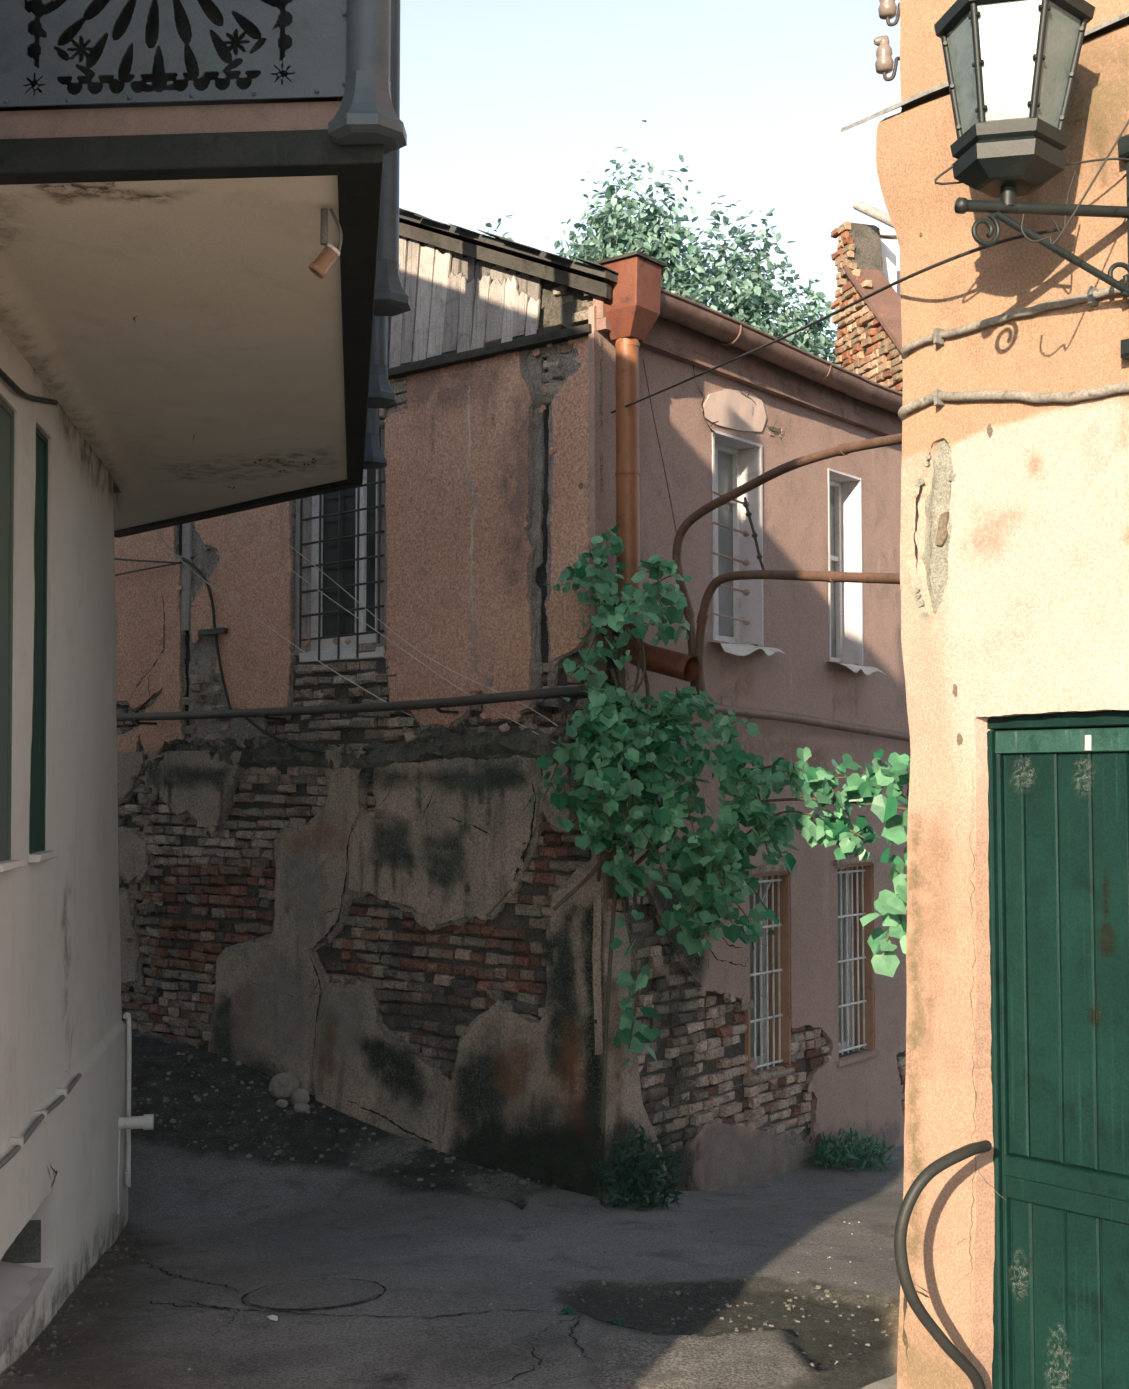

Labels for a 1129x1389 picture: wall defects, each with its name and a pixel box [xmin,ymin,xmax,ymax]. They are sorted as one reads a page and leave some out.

spalling [533,343,573,413]
spalling [913,439,956,619]
spalling [260,636,422,748]
spalling [439,625,630,731]
spalling [118,766,328,1047]
spalling [320,812,833,1157]
water stain [563,903,605,1197]